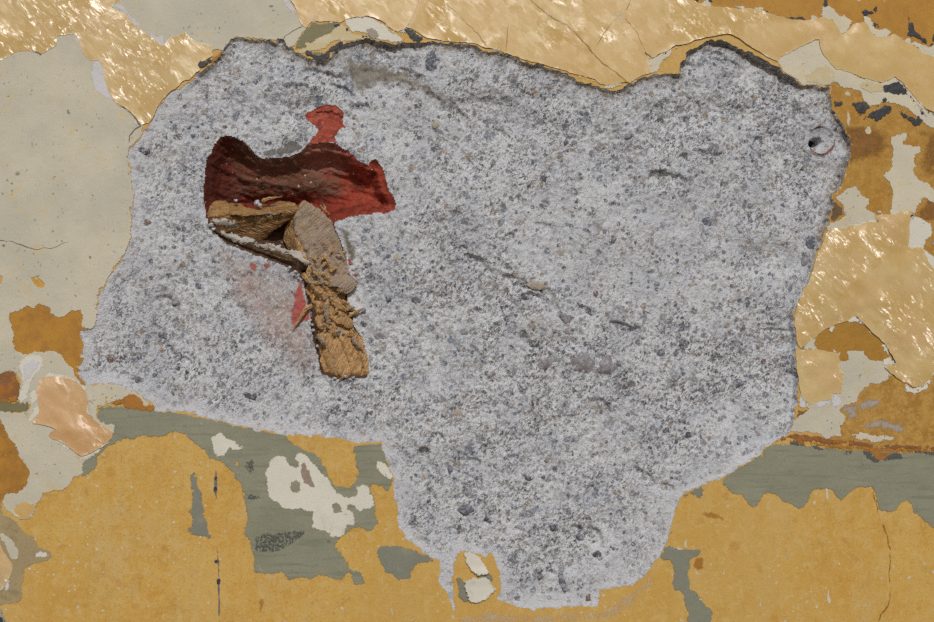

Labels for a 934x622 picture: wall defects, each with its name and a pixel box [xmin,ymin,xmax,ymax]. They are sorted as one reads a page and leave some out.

peeling [0,0,223,125]
peeling [284,0,934,114]
peeling [852,97,892,121]
peeling [900,111,923,126]
spalling [78,38,851,612]
peeling [794,210,934,395]
peeling [18,354,114,461]
peeling [863,451,903,463]
peeling [0,533,18,591]
crack [873,496,891,620]